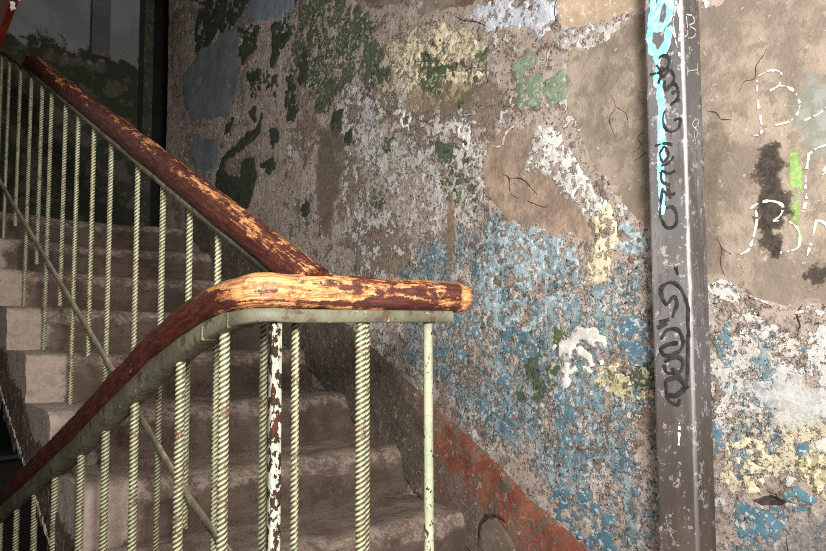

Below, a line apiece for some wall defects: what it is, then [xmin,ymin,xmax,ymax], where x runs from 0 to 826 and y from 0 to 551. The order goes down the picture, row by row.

flaking render [182,0,651,364]
crack [504,174,547,207]
flaking render [698,0,826,314]
peeling [543,314,654,469]
crack [478,514,505,548]
peeling [536,485,626,551]
peeling [712,420,826,545]